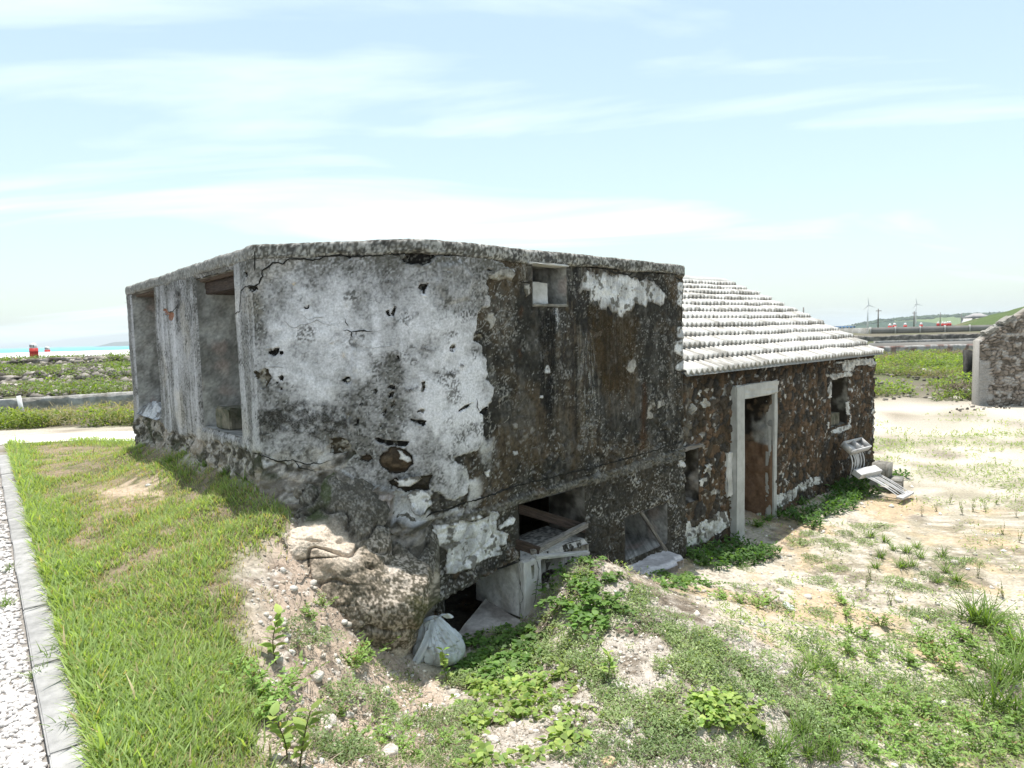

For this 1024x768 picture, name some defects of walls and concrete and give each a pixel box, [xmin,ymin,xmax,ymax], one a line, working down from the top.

crack [235,251,401,314]
peeling [484,267,530,296]
peeling [579,270,683,318]
peeling [473,312,496,341]
peeling [626,358,640,381]
peeling [674,326,684,372]
peeling [459,389,518,429]
peeling [646,399,665,420]
crack [254,453,327,471]
spalling [327,385,433,517]
crack [426,441,683,518]
peeling [425,511,516,574]